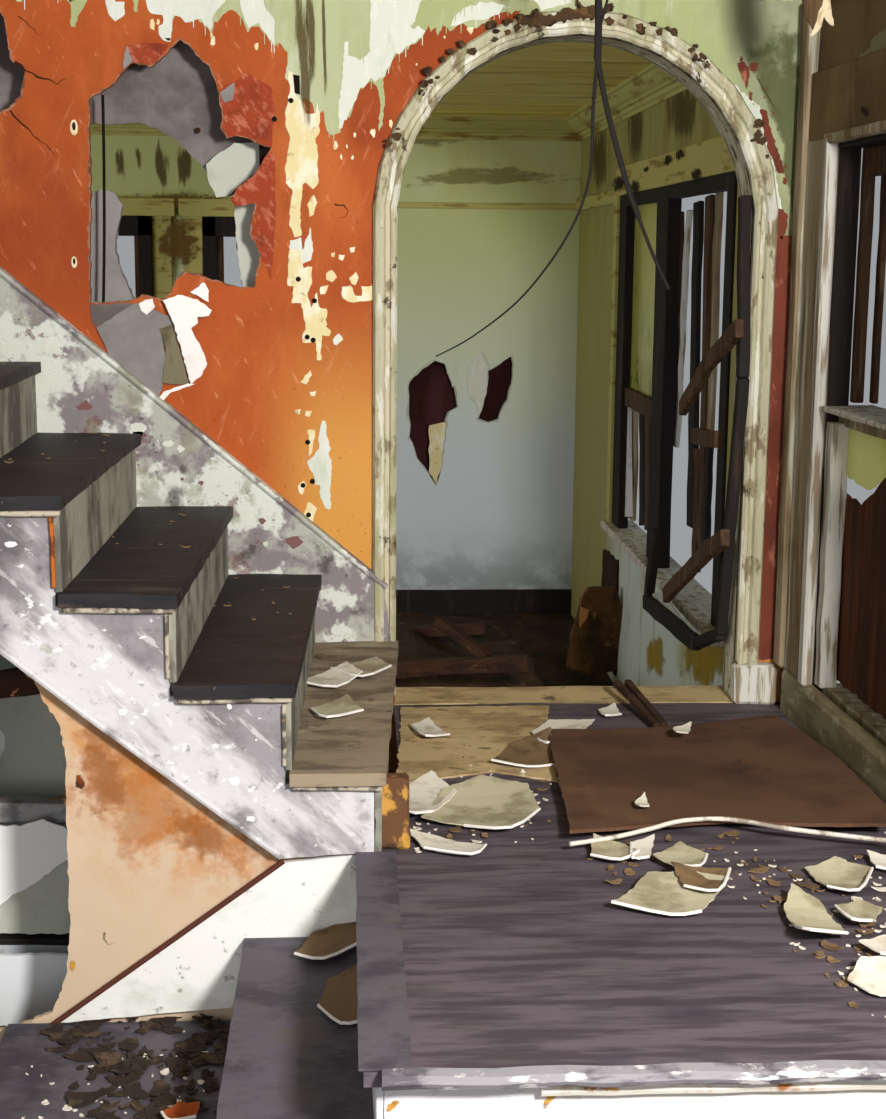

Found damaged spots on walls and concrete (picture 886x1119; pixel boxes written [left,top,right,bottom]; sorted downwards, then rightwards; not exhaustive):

peeling [57,0,87,27]
flaking render [0,0,66,155]
peeling [70,0,802,396]
peeling [35,373,52,394]
peeling [75,400,93,410]
flaking render [406,348,514,486]
peeling [130,423,147,439]
flaking render [295,409,332,521]
peeling [241,509,266,529]
peeling [285,536,303,549]